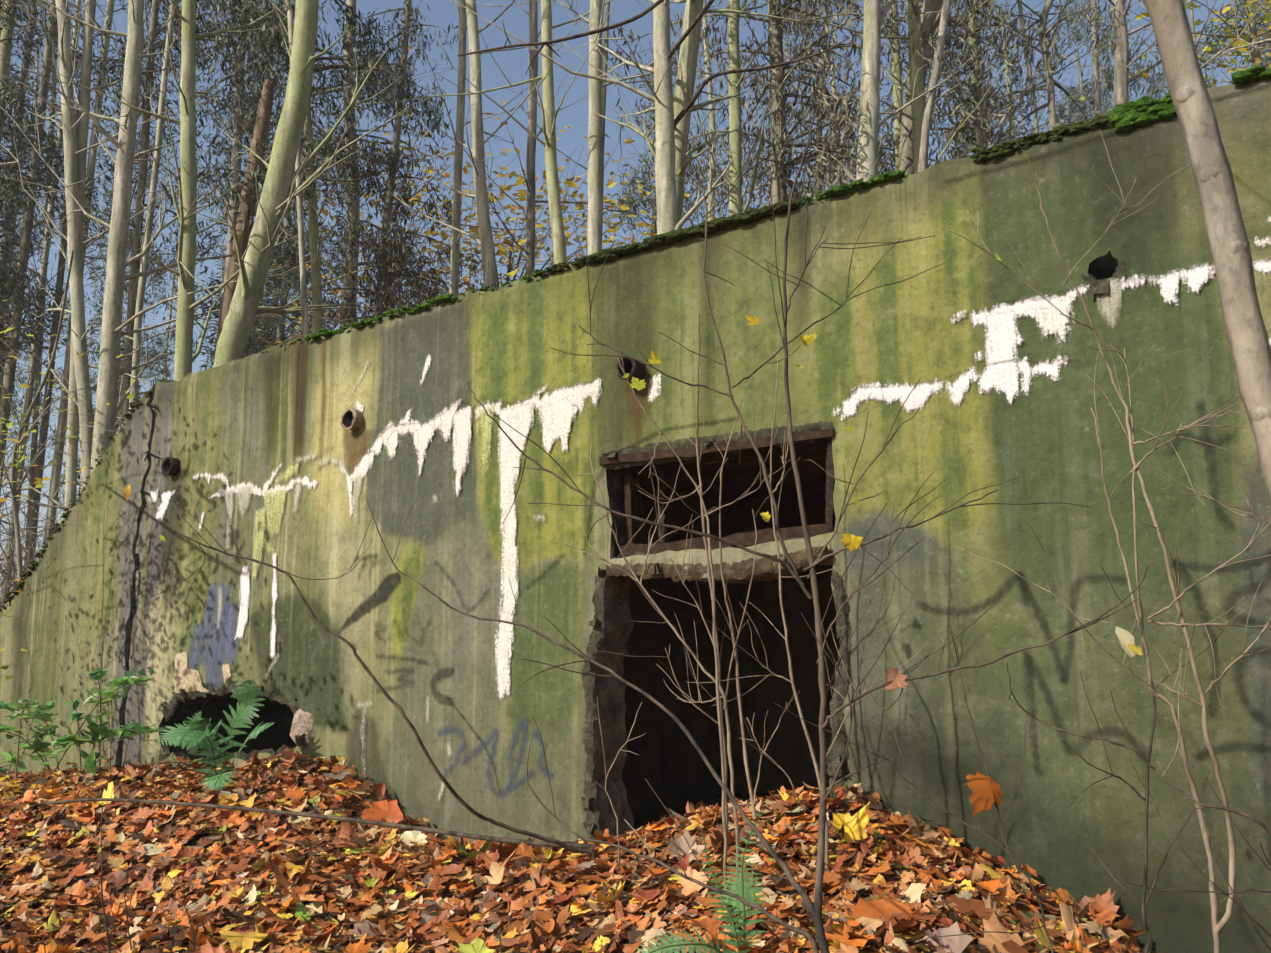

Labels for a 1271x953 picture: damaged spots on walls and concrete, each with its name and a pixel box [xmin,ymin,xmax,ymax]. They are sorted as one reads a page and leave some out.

water stain [1253,238,1271,273]
water stain [649,374,661,402]
water stain [833,264,1215,421]
crack [115,379,163,767]
water stain [193,378,601,698]
spalling [158,652,315,747]
spalling [581,543,852,843]